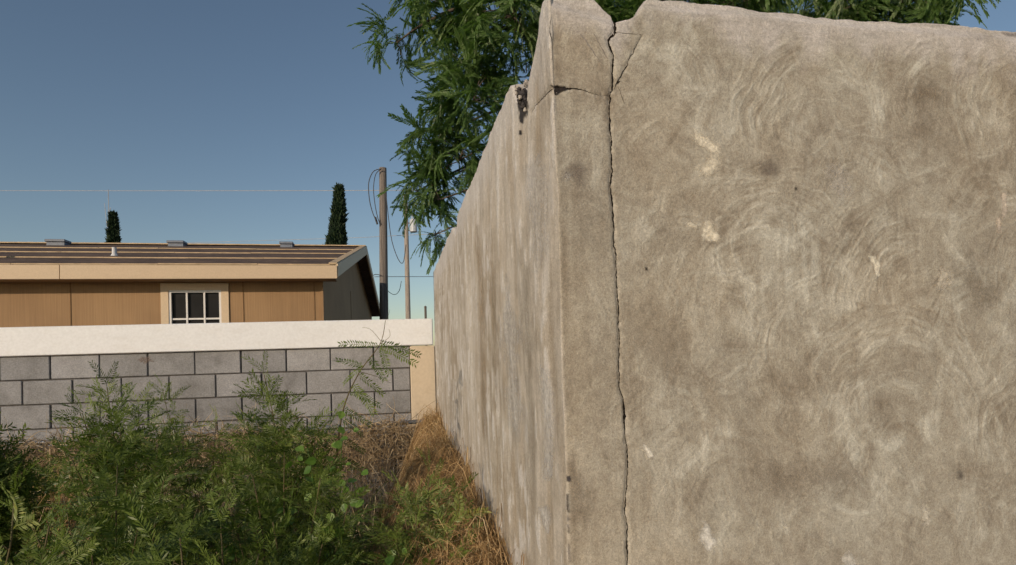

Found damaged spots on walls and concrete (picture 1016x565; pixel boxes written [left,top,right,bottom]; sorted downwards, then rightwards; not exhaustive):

crack [535,22,642,563]